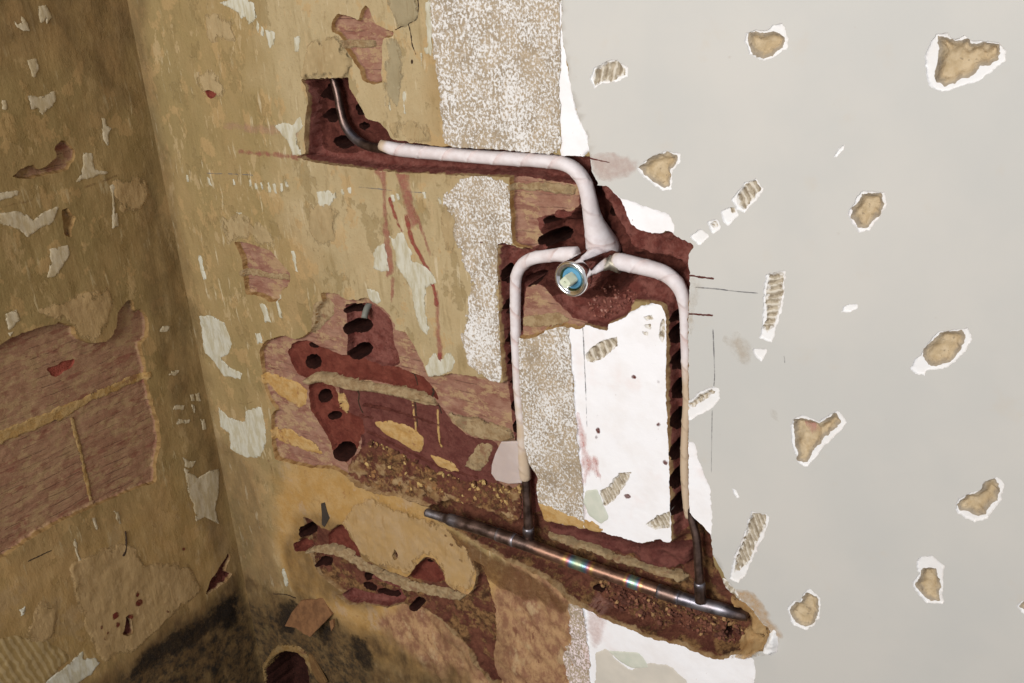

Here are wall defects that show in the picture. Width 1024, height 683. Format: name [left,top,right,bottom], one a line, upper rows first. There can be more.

flaking render [294,0,432,143]
flaking render [924,32,1007,92]
flaking render [507,176,586,252]
spalling [589,166,687,276]
flaking render [519,262,662,339]
flaking render [910,327,972,376]
flaking render [219,212,522,683]
flaking render [790,410,847,467]
damp [101,593,143,640]
damp [132,596,237,676]
damp [276,600,297,633]
damp [352,637,372,669]